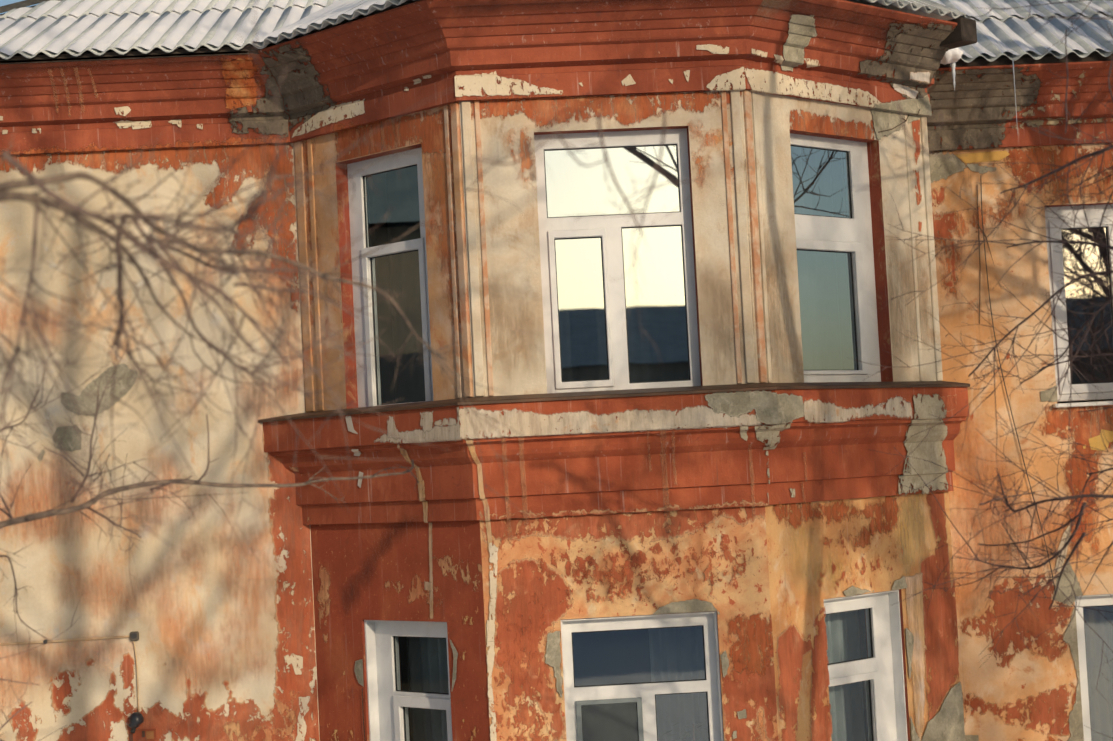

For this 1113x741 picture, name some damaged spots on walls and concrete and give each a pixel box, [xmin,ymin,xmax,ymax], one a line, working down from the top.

peeling [0,41,453,312]
spalling [454,14,1113,288]
spalling [37,363,138,462]
peeling [8,700,42,741]
peeling [49,432,353,741]
spalling [343,659,364,687]
peeling [374,385,1113,741]